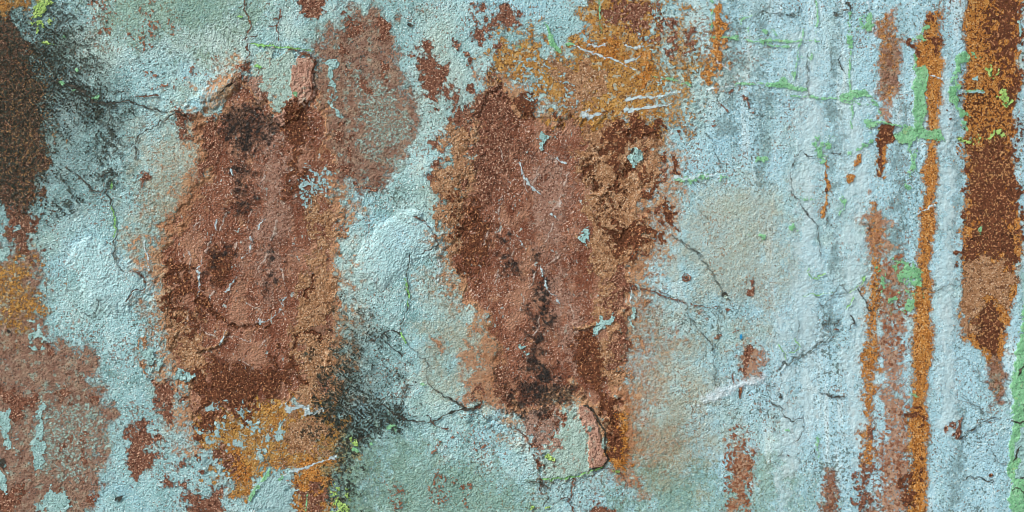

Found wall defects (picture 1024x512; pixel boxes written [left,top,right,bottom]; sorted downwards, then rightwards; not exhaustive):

rust [473,0,754,147]
rust [0,0,68,356]
crack [50,80,192,302]
rust [160,111,213,245]
rust [816,0,1024,512]
rust [456,323,518,409]
crack [369,216,626,512]
rust [187,391,363,512]
rust [427,432,472,510]
rust [719,423,760,512]